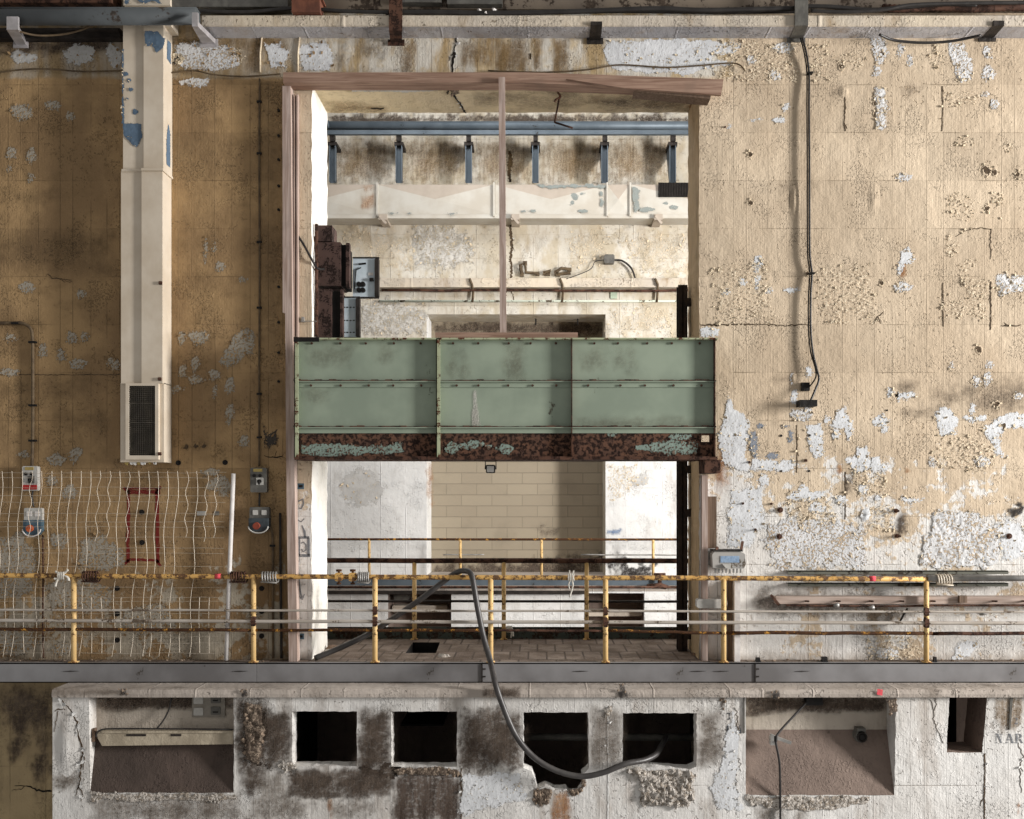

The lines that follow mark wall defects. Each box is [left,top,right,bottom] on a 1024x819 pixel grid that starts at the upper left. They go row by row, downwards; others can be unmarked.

peeling [144,31,246,88]
crack [446,38,466,113]
peeling [603,38,916,130]
rust [293,425,723,505]
peeling [717,367,925,572]
peeling [929,391,1024,472]
peeling [920,509,1024,570]
damp [3,690,51,778]
crack [12,697,85,801]
damp [236,700,460,819]
damp [459,687,521,775]
spalling [626,767,697,810]